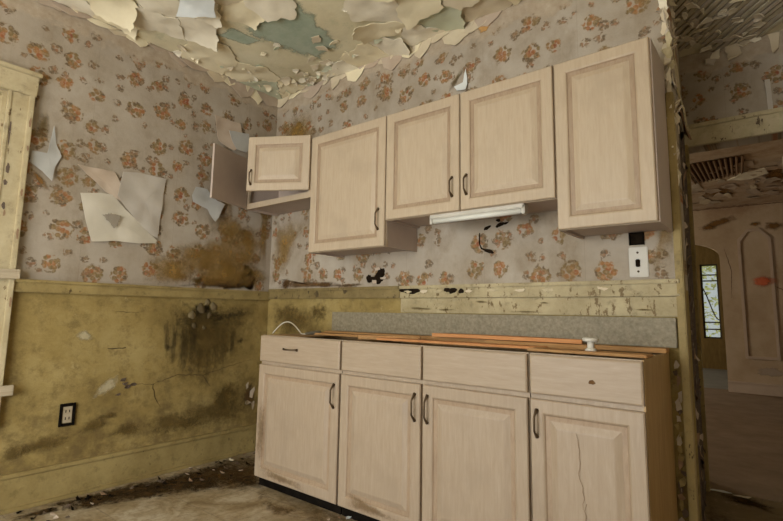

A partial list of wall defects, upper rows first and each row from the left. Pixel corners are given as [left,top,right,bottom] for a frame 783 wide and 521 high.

peeling [48,0,521,108]
leakage [156,218,267,288]
leakage [278,229,296,264]
spalling [366,267,386,284]
flaking render [656,0,783,521]